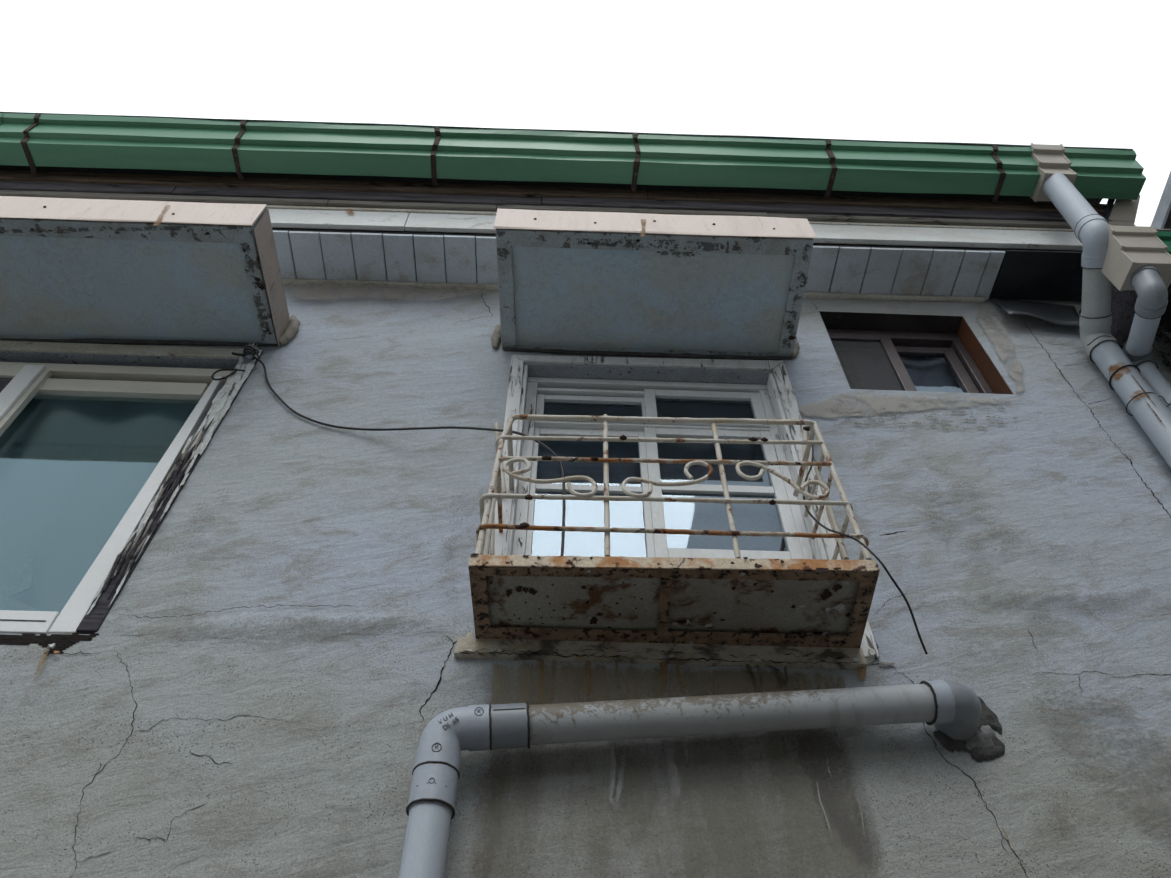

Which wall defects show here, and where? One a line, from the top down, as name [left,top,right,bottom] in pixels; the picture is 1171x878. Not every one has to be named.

peeling [1,226,188,235]
peeling [241,243,272,336]
peeling [567,238,741,257]
peeling [782,274,808,349]
crack [1024,322,1170,515]
crack [419,635,914,720]
damp [492,663,843,705]
crack [1027,629,1171,696]
crack [71,652,302,876]
damp [662,728,875,878]
crack [923,722,1028,878]